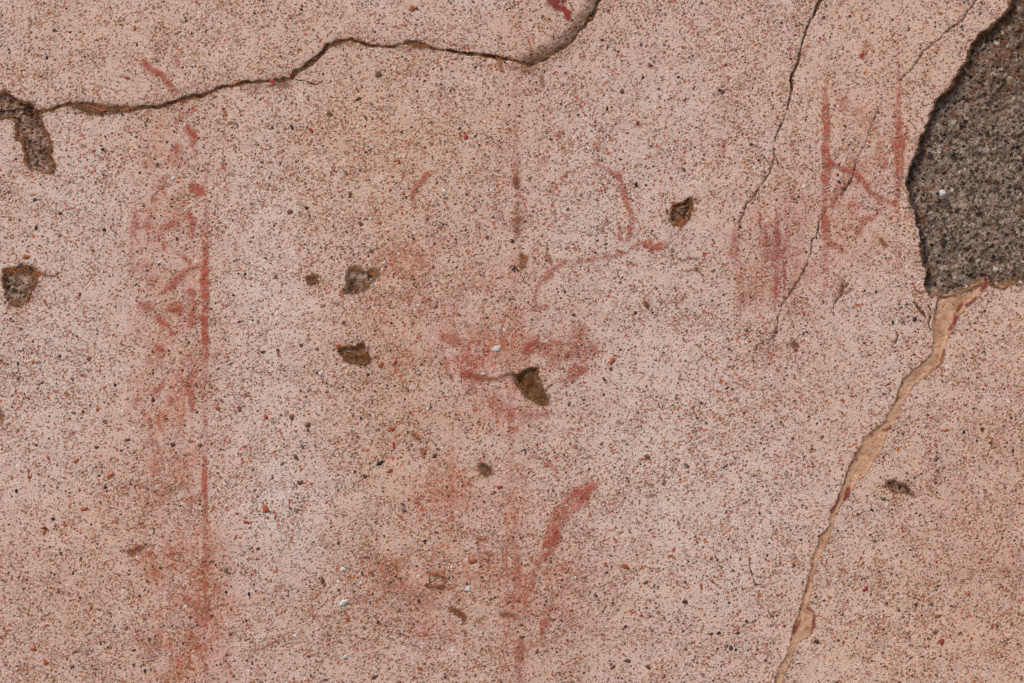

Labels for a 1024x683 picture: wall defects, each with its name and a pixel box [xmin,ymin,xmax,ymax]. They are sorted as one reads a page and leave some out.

flaking render [0,89,56,174]
crack [28,0,601,115]
crack [738,0,822,230]
crack [753,0,976,363]
flaking render [905,0,1024,298]
crack [775,274,989,683]